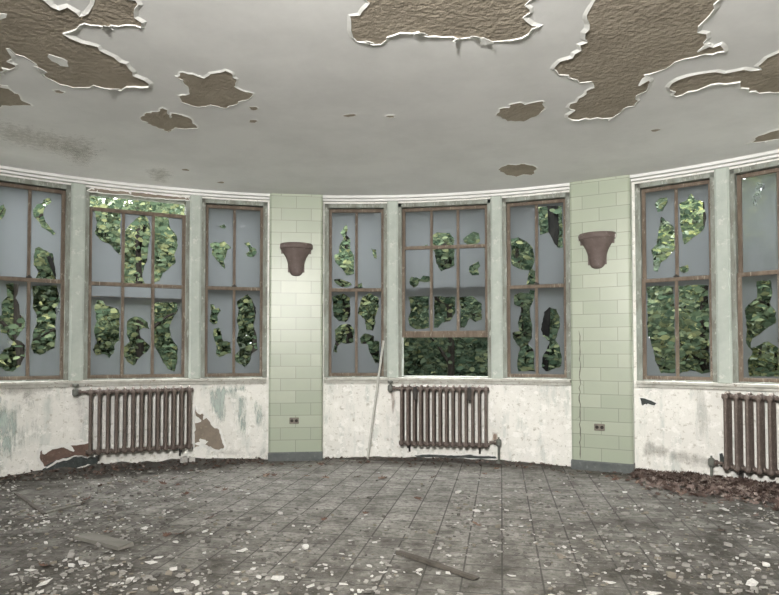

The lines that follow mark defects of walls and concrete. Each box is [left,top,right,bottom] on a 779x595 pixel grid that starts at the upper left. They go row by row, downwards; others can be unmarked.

peeling [347,0,544,46]
peeling [0,0,153,107]
peeling [139,107,199,132]
peeling [174,69,259,123]
peeling [495,100,546,122]
peeling [550,0,729,121]
peeling [665,50,779,97]
peeling [745,128,779,144]
peeling [497,163,538,177]
spalling [191,406,226,452]
spalling [36,441,98,470]